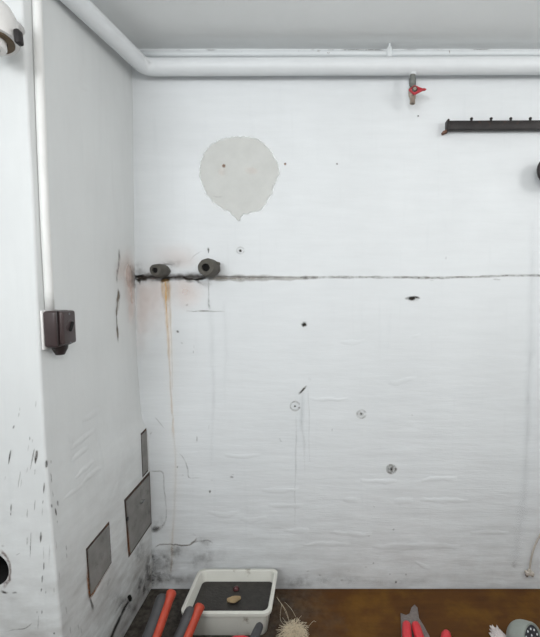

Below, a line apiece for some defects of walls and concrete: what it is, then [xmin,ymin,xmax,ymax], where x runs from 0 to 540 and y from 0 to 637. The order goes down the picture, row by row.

peeling [200,137,279,221]
crack [136,273,262,281]
crack [114,291,122,338]